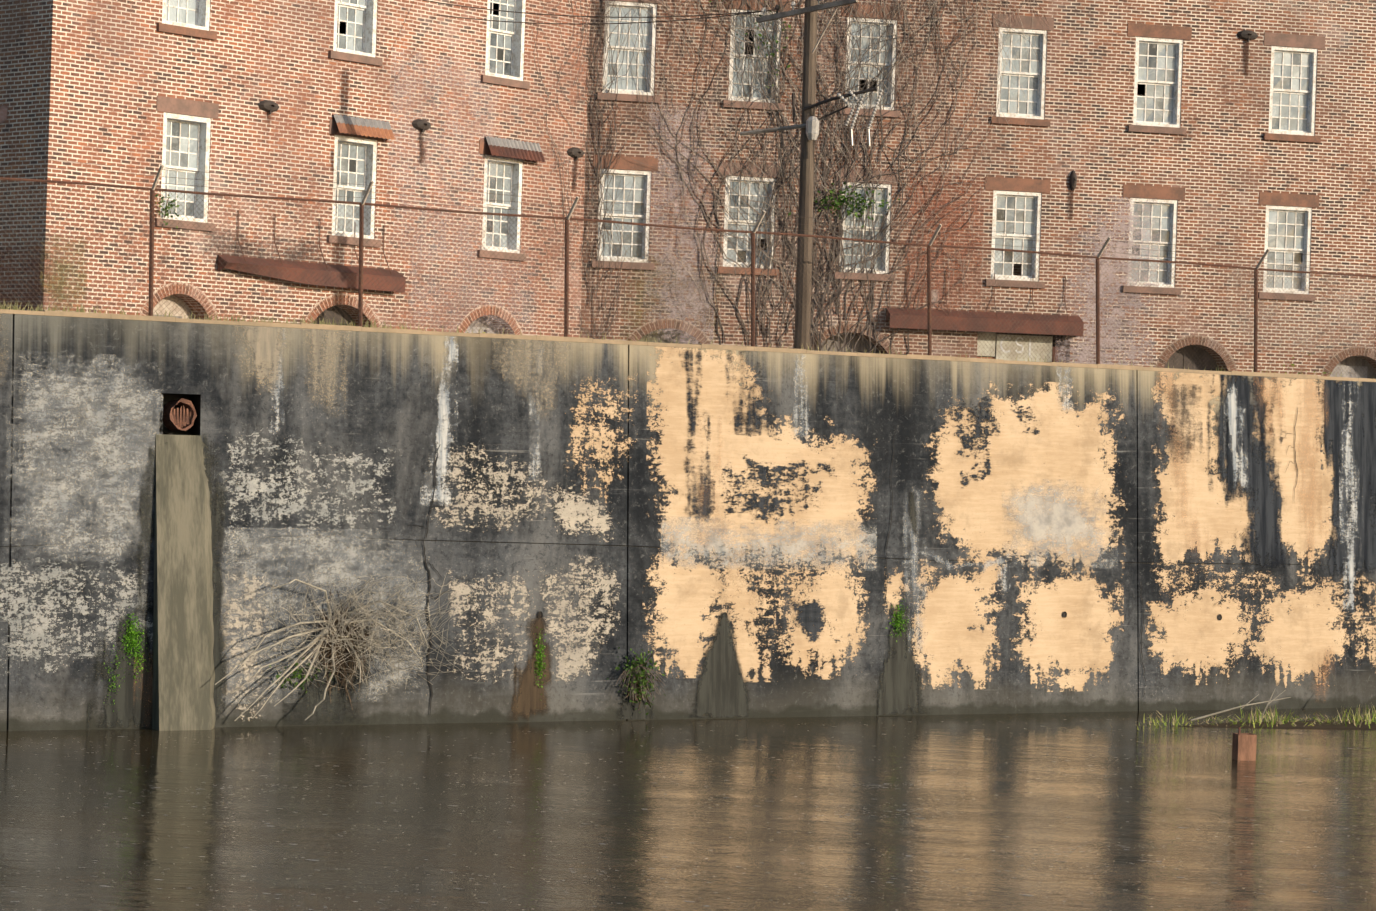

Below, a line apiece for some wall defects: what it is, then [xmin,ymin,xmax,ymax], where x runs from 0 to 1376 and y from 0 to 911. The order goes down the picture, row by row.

peeling [0,364,163,676]
damp [236,325,286,428]
peeling [212,428,426,725]
damp [305,329,348,402]
damp [421,336,459,505]
peeling [428,346,1127,692]
damp [945,396,1000,488]
damp [1011,406,1040,435]
damp [1168,375,1290,568]
peeling [1145,372,1376,688]
damp [1317,380,1376,609]